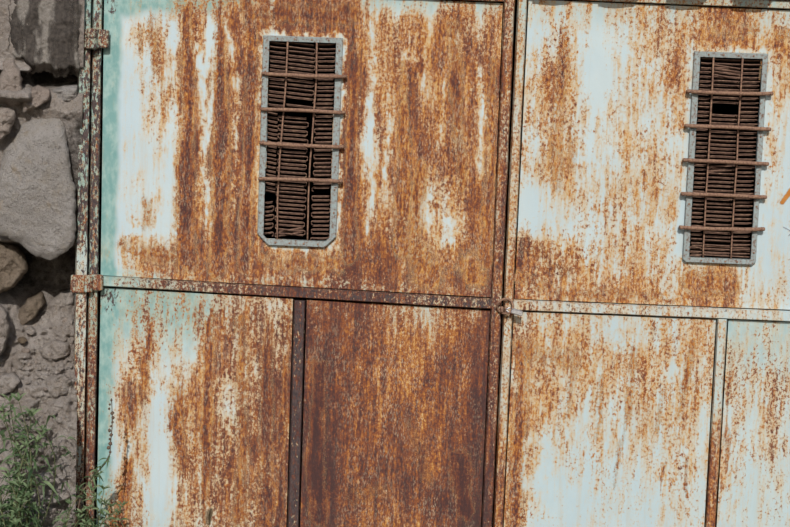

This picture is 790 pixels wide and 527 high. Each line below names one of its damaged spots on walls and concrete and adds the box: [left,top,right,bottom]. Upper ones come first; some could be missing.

rust [108,456,133,527]
rust [124,321,153,429]
rust [119,2,199,276]
rust [168,385,187,473]
rust [200,308,216,523]
rust [229,311,291,527]
rust [208,0,363,280]
rust [391,61,445,291]
rust [505,338,582,527]
rust [549,25,575,190]
rust [514,235,674,305]
rust [680,268,740,298]